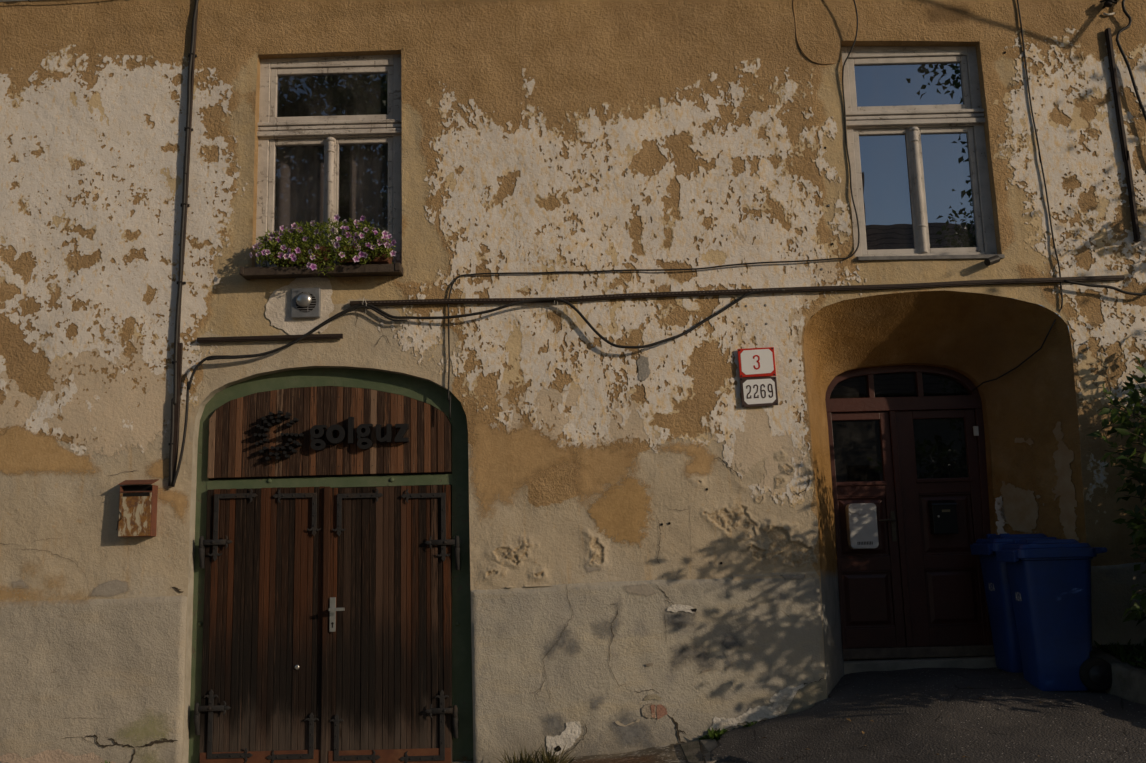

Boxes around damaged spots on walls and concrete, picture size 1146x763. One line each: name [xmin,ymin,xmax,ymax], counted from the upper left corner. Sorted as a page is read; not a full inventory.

peeling [0,42,249,460]
peeling [378,56,867,588]
peeling [993,15,1146,415]
crack [61,717,178,763]
spalling [546,721,581,756]
spalling [710,679,827,730]